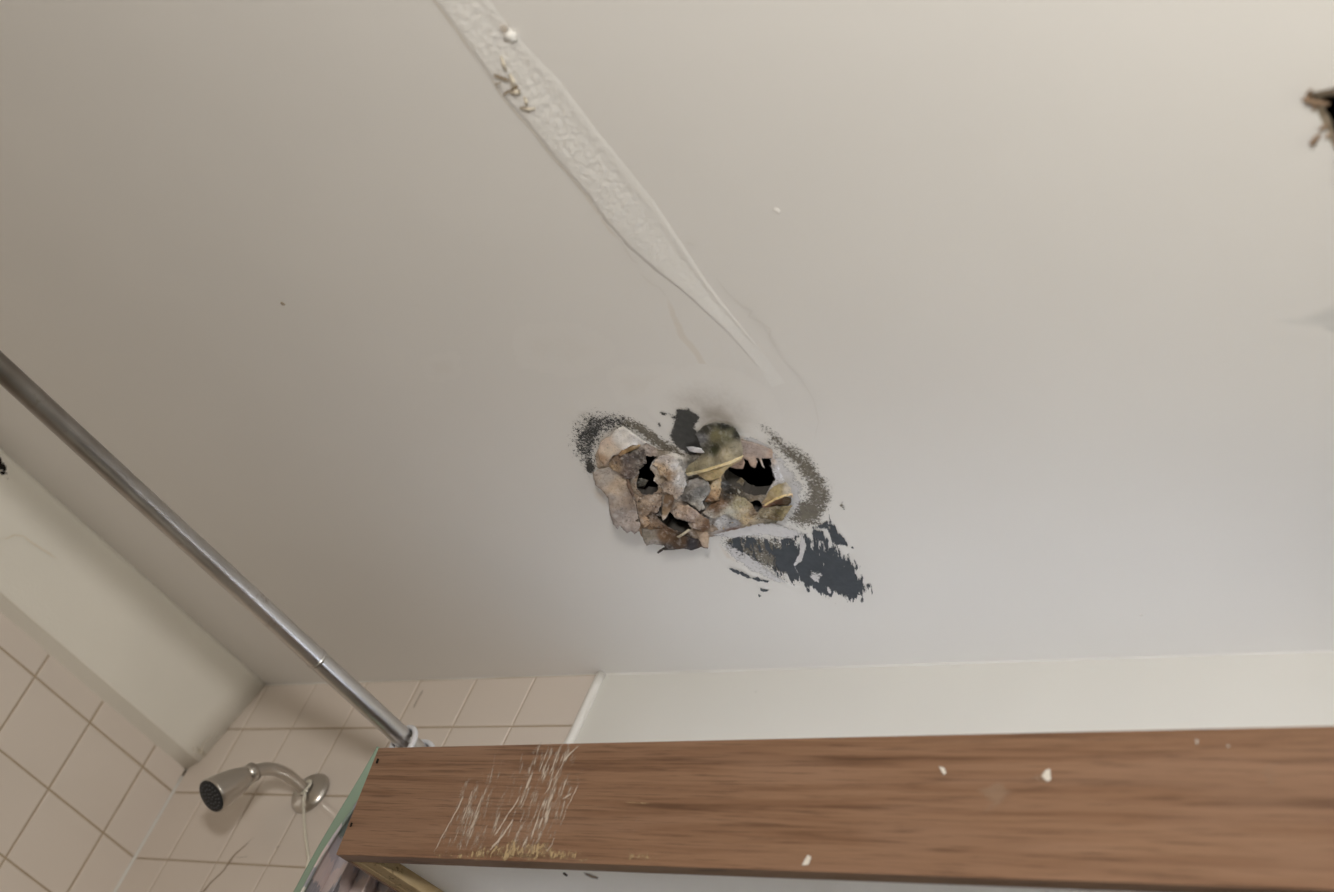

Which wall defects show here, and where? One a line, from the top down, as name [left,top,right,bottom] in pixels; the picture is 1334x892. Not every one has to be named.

spalling [592,423,831,594]